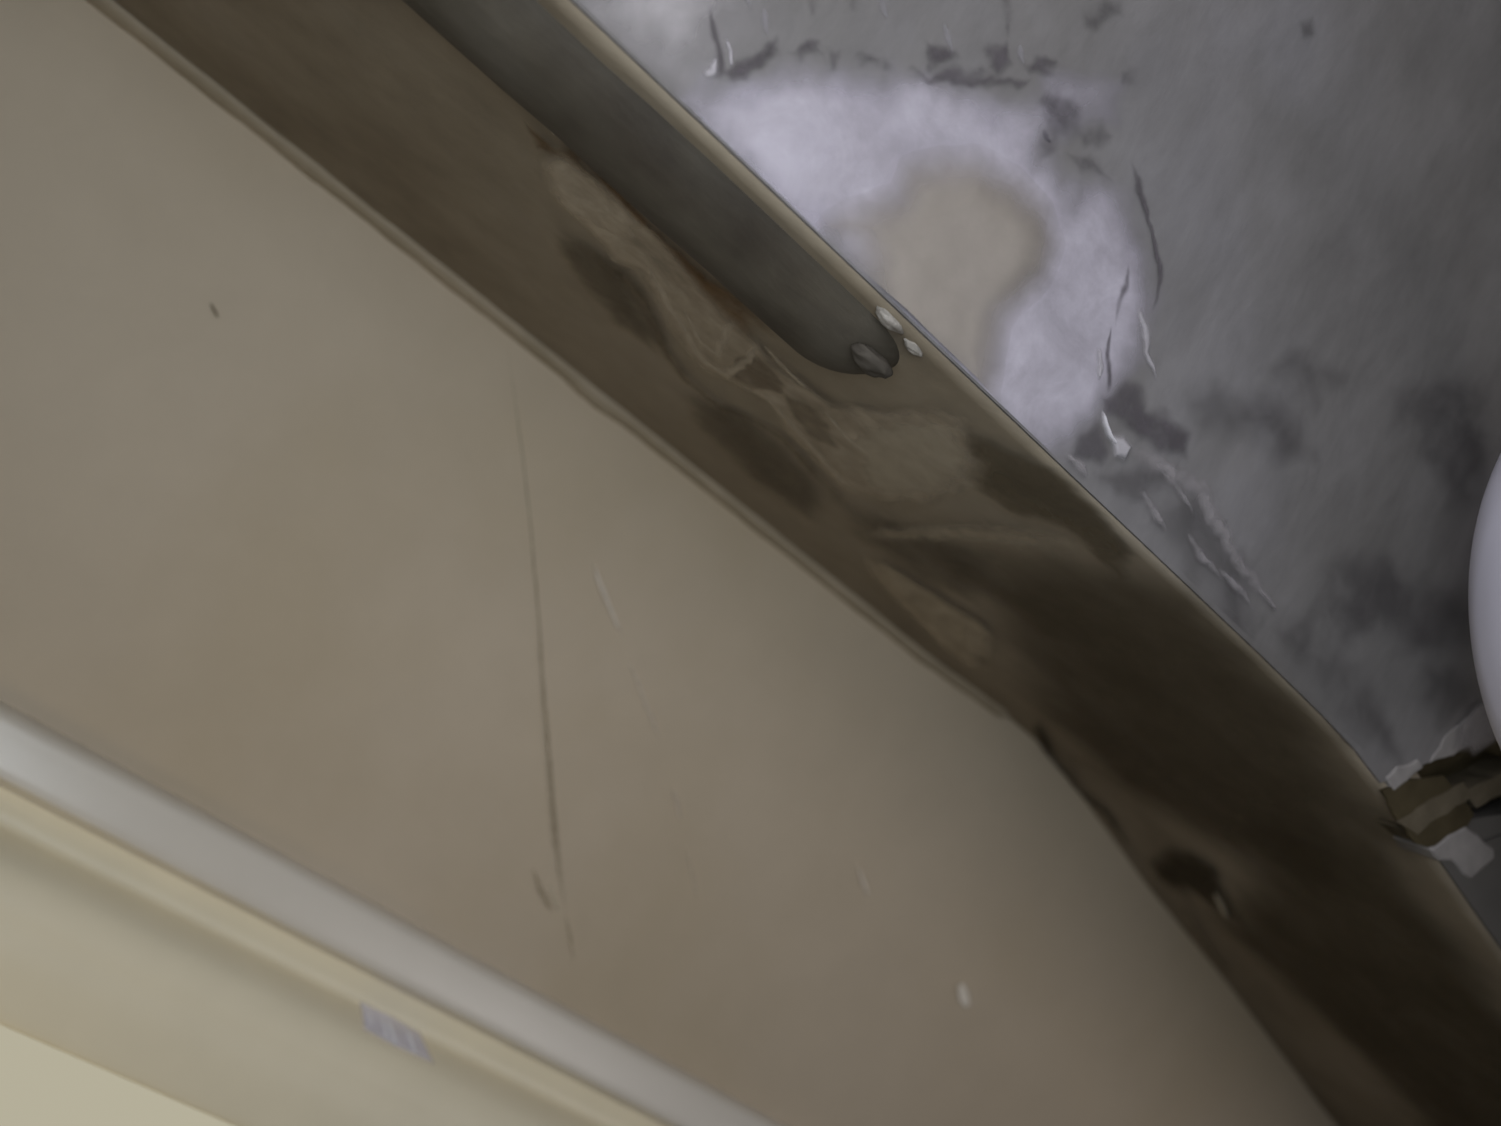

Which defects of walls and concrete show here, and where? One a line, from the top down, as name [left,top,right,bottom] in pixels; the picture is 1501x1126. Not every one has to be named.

leakage [593,0,718,63]
leakage [695,78,1142,444]
leakage [976,444,1127,570]
flaking render [1069,388,1276,608]
crack [517,418,557,845]
peeling [1461,704,1495,751]
leakage [992,582,1501,1126]